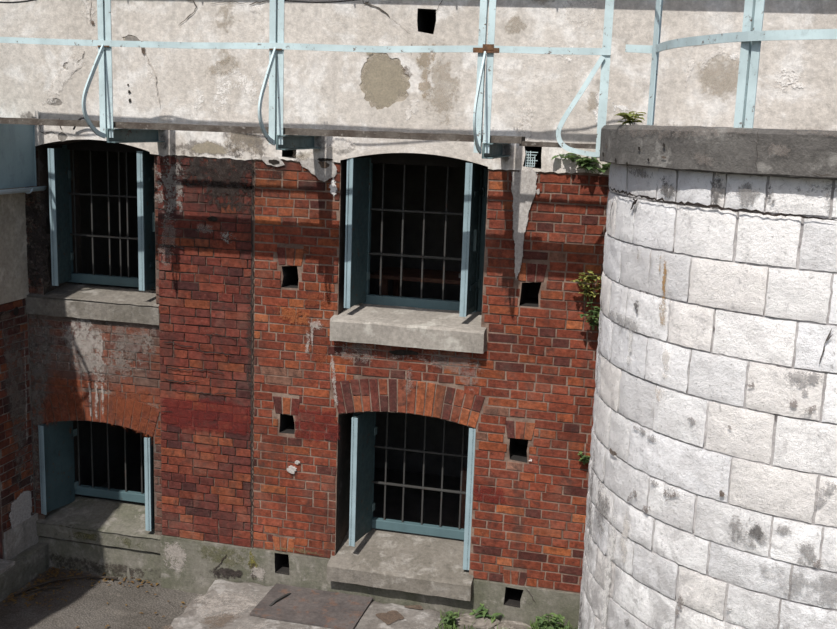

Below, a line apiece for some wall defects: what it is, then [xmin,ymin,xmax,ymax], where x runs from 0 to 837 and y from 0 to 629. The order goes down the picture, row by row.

crack [180,0,265,24]
crack [364,2,411,33]
flaking render [362,52,412,109]
water stain [405,44,435,120]
flaking render [300,157,337,195]
crack [604,187,837,221]
corrosion [659,257,667,324]
crack [819,329,833,364]
peeling [9,491,32,528]